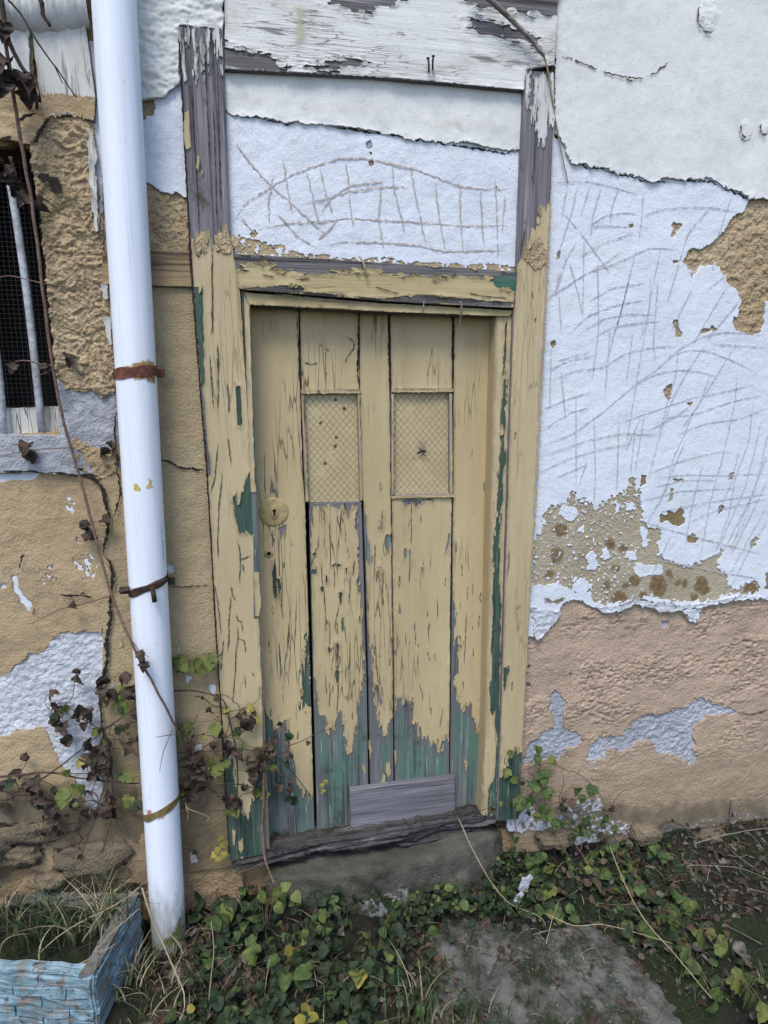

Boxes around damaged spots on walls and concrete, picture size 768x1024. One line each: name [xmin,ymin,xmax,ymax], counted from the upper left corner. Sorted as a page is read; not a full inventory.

peeling [330,0,406,14]
peeling [466,0,558,49]
peeling [86,128,107,250]
peeling [146,27,555,308]
peeling [103,316,113,345]
rust [126,360,155,382]
spalling [673,198,768,336]
crack [3,412,122,737]
peeling [225,323,768,861]
peeling [0,628,115,810]